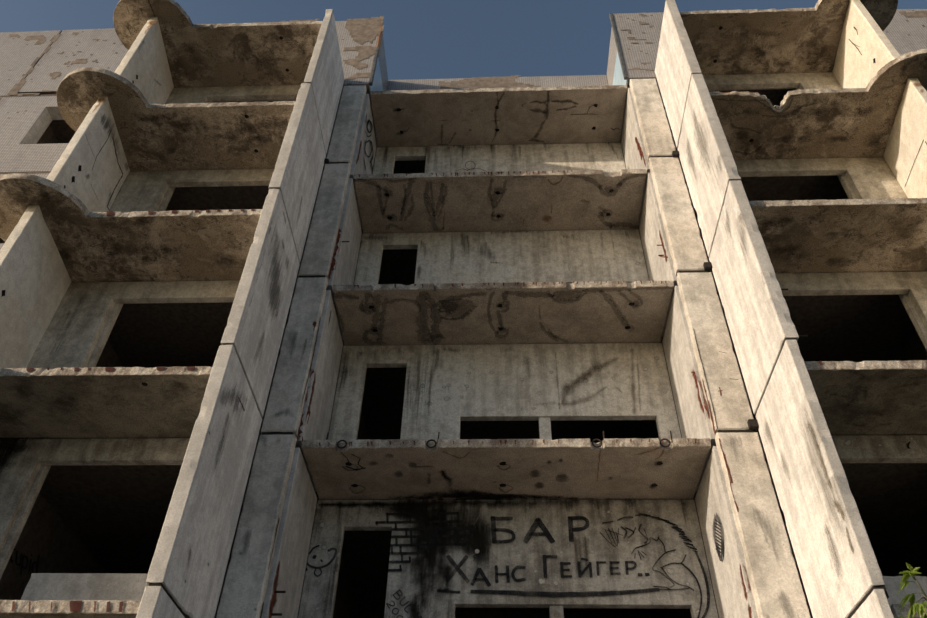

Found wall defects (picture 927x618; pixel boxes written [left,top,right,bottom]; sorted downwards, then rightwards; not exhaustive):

peeling [0,34,98,100]
peeling [343,16,384,79]
peeling [438,75,541,89]
crack [85,129,125,210]
rust [691,372,739,512]
damp [316,482,577,618]
rust [260,561,280,618]